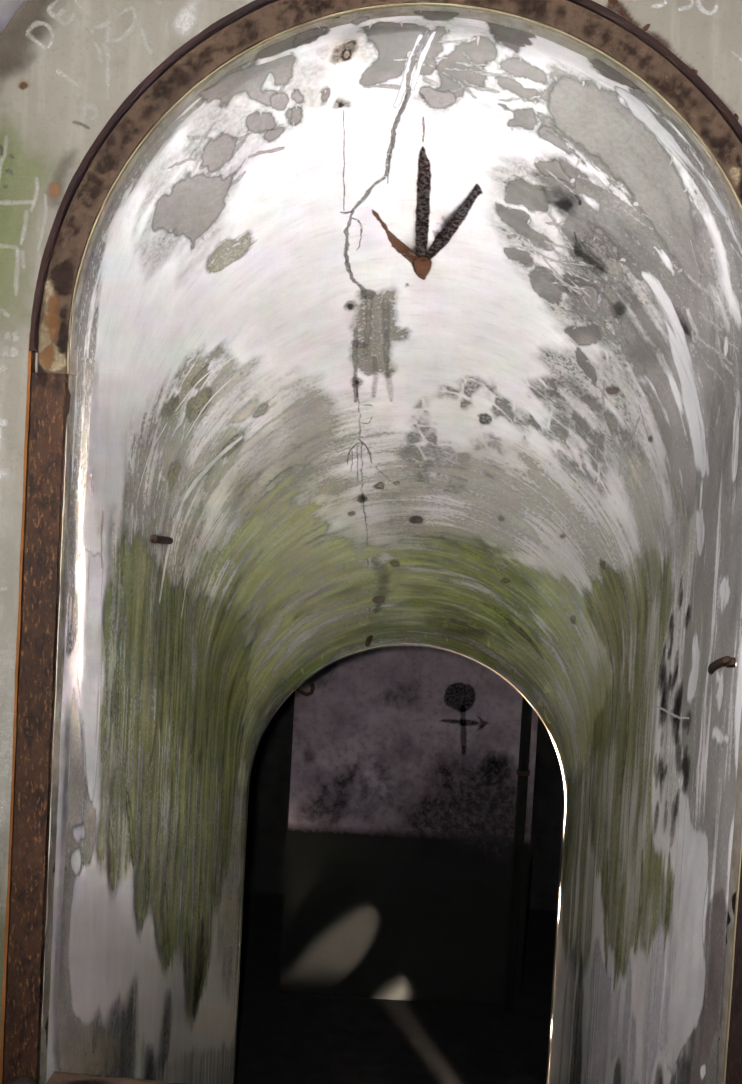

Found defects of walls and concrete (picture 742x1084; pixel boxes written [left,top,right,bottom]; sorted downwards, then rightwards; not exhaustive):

rust [607,0,669,49]
crack [340,30,436,291]
peeling [37,26,330,654]
leakage [351,290,408,402]
leakage [654,580,690,835]
leakage [569,957,583,1084]
leakage [613,1061,621,1084]
leakage [655,1062,689,1084]